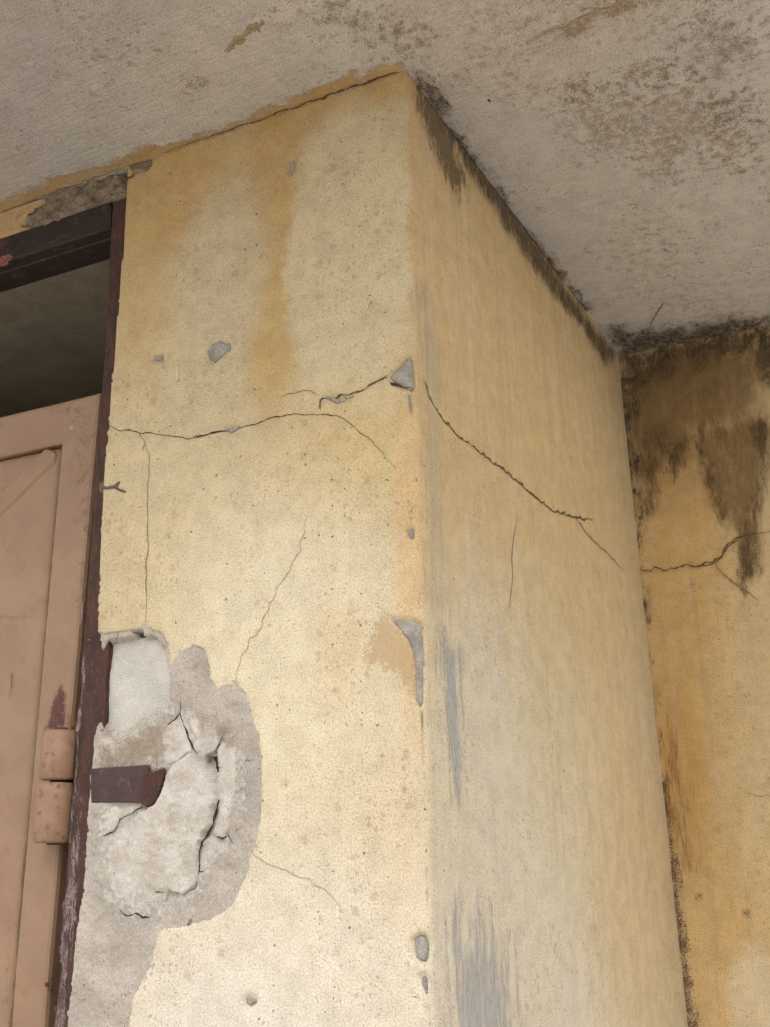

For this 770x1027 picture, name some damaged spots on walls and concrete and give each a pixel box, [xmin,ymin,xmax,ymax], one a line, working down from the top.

damp [527,0,664,44]
spalling [25,173,128,229]
damp [410,69,770,596]
crack [109,375,392,621]
crack [235,520,306,676]
crack [423,380,770,601]
corrosion [136,761,165,809]
spalling [45,623,263,1027]